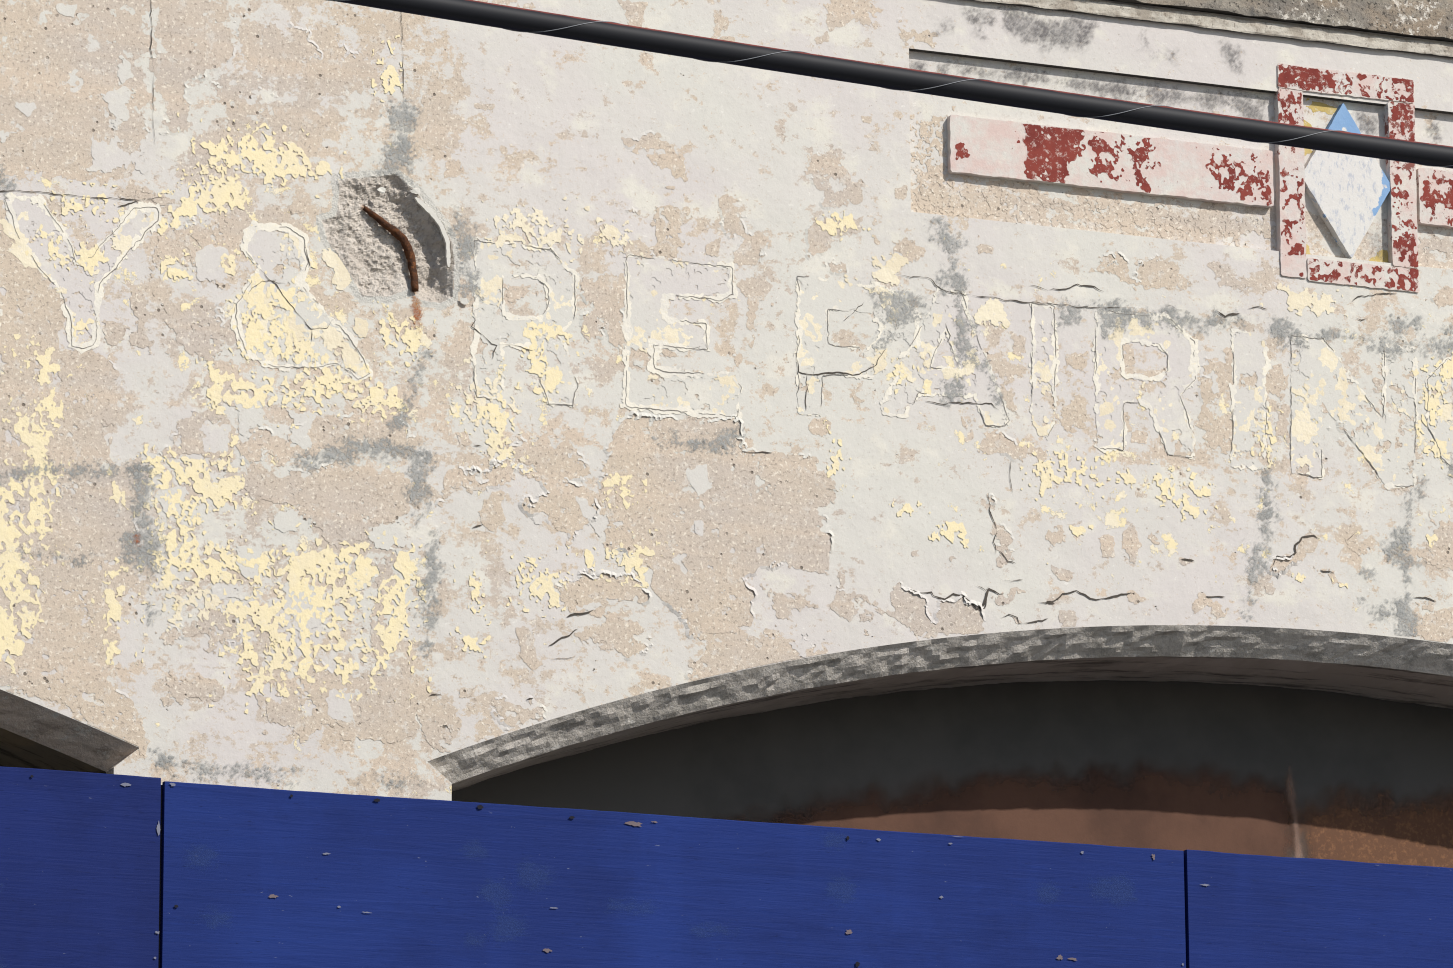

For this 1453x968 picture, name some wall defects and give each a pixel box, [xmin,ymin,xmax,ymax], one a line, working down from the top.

peeling [1277,65,1414,141]
peeling [895,106,1453,318]
peeling [0,0,548,759]
peeling [435,130,1026,680]
peeling [961,297,1218,528]
peeling [1195,347,1291,477]
peeling [1372,348,1453,494]
crack [913,464,1130,624]
peeling [1045,525,1160,582]
peeling [1265,532,1348,595]
crack [1270,533,1355,573]
peeling [1407,600,1453,642]